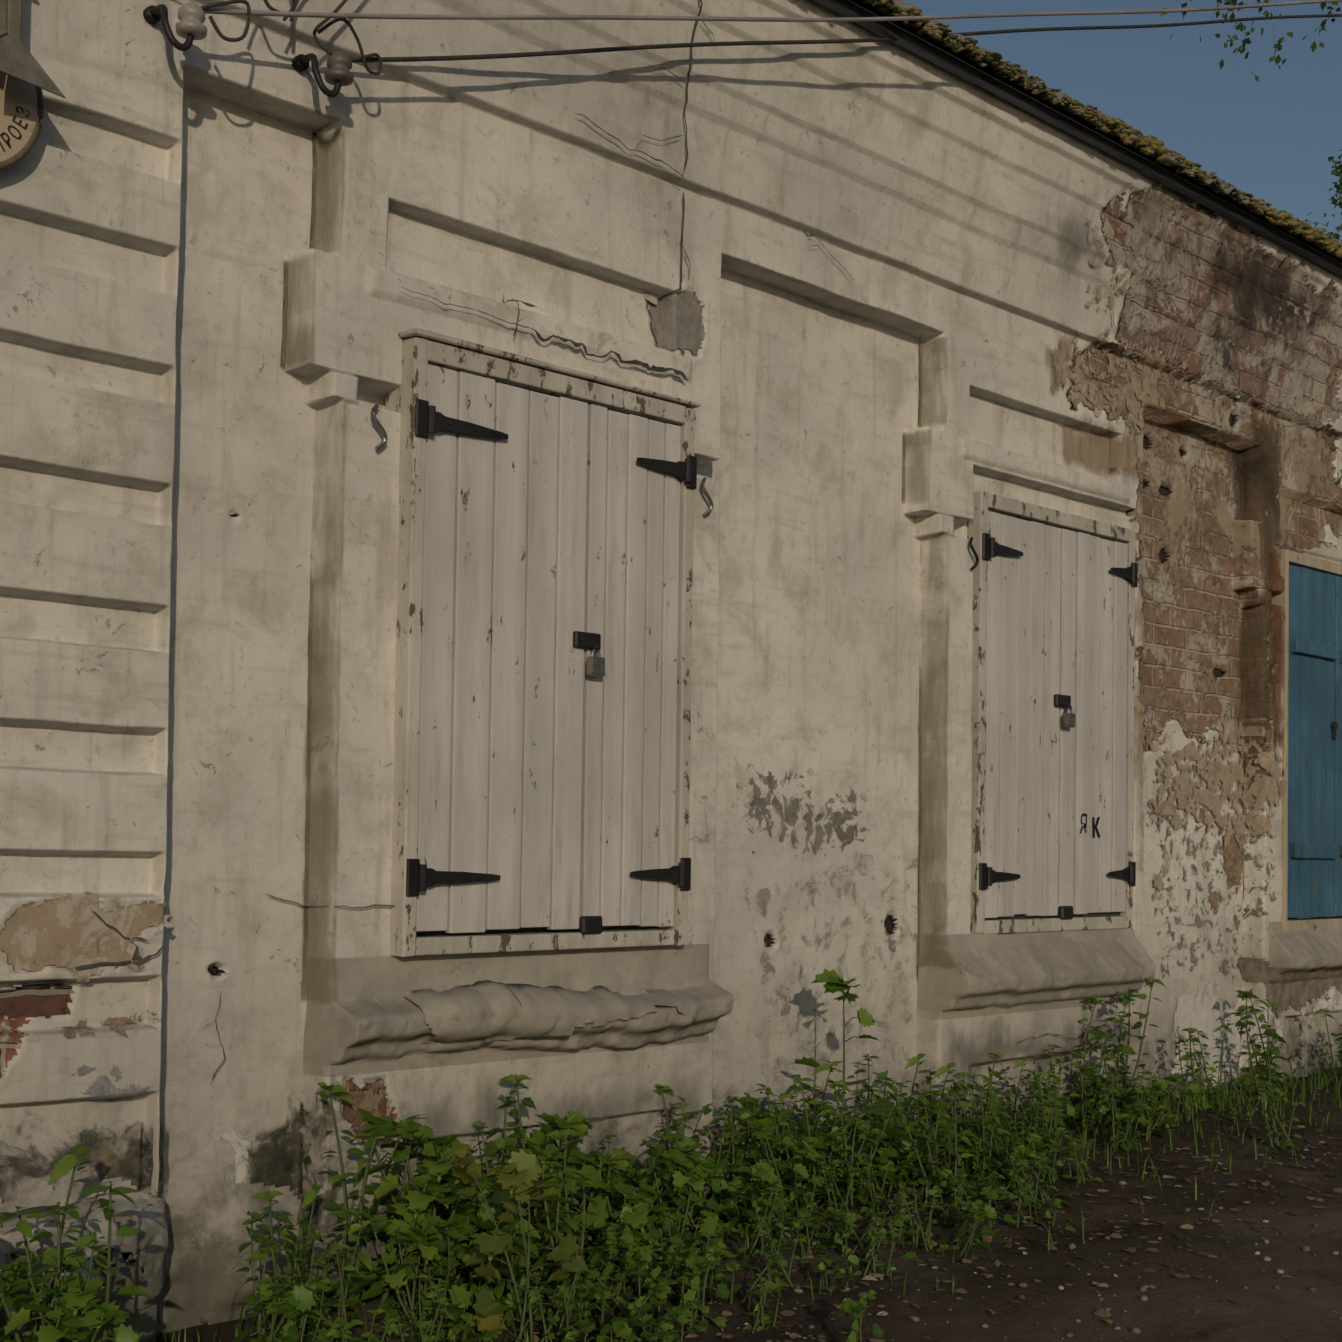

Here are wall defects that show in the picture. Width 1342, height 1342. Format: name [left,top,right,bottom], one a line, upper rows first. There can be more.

crack [577,0,715,298]
crack [402,287,689,381]
spalling [644,290,705,356]
spalling [1042,182,1342,1090]
peeling [736,764,872,900]
peeling [0,891,171,1079]
peeling [70,1064,150,1102]